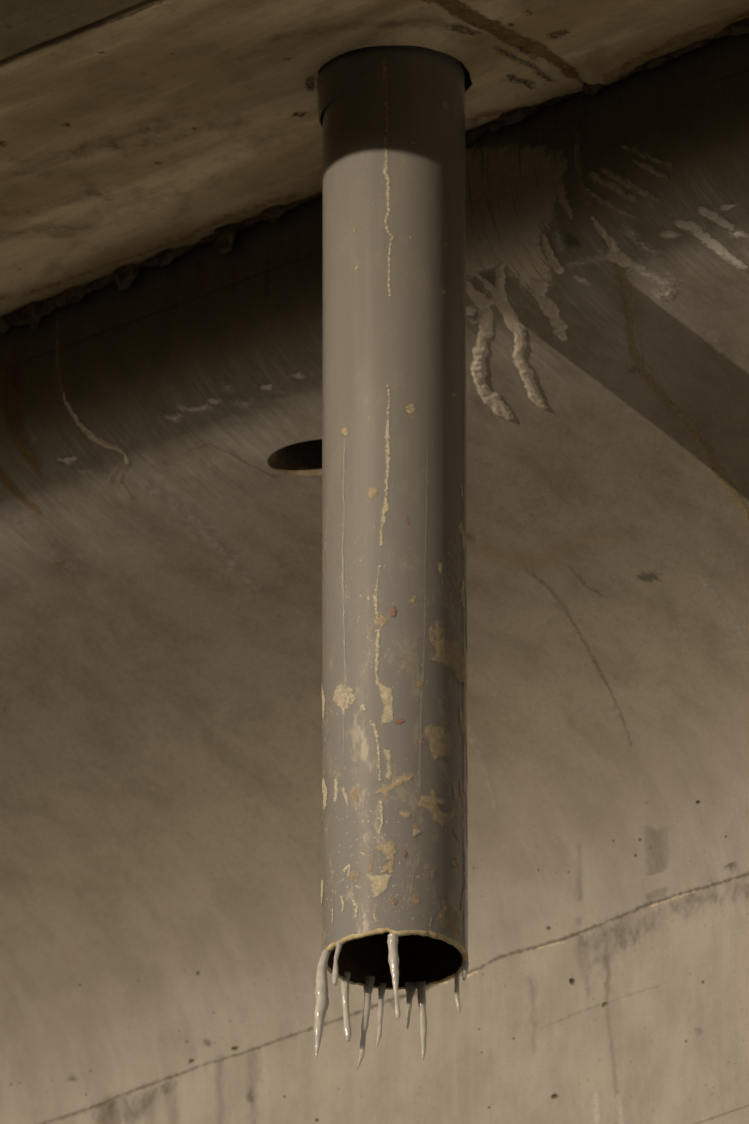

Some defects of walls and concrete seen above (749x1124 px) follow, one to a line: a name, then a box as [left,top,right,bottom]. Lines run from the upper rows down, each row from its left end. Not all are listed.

damp [57,314,131,497]
damp [575,136,749,520]